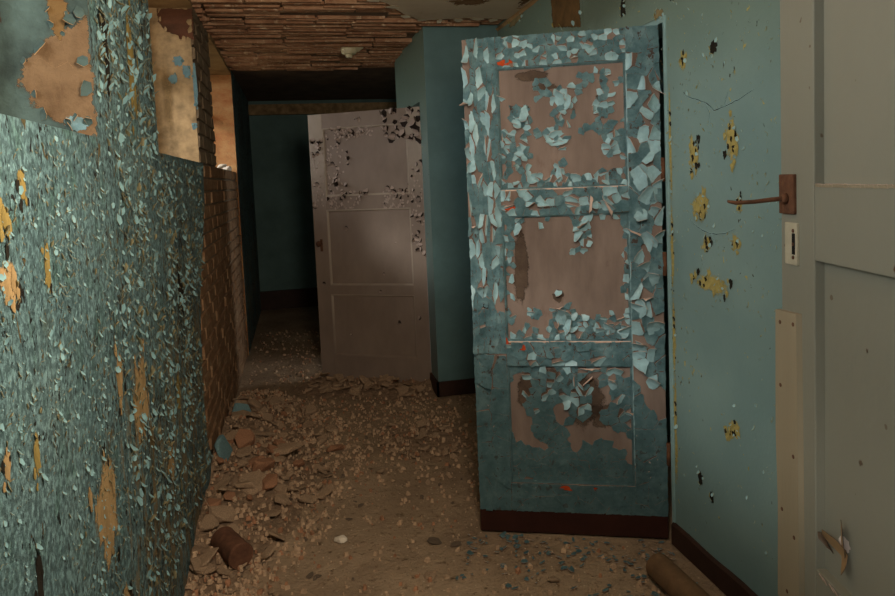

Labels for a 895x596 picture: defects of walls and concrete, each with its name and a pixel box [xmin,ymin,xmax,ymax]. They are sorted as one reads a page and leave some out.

flaking render [0,0,248,596]
peeling [309,106,422,210]
peeling [382,159,426,256]
peeling [460,0,753,515]
spalling [818,522,851,575]